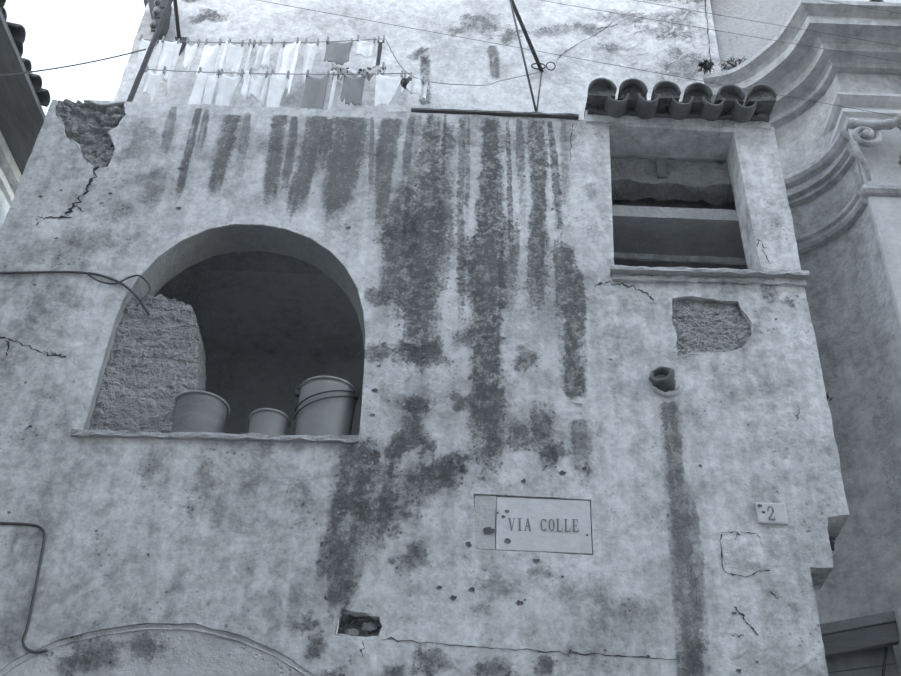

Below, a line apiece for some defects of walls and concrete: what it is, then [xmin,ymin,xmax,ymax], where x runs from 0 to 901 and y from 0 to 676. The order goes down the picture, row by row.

flaking render [54,99,126,168]
leakage [177,108,209,193]
leakage [209,115,240,192]
crack [36,166,99,225]
crack [0,336,66,358]
leakage [264,47,592,620]
crack [595,280,655,304]
flaking render [672,295,753,356]
leakage [661,402,709,676]
flaking render [335,610,381,637]